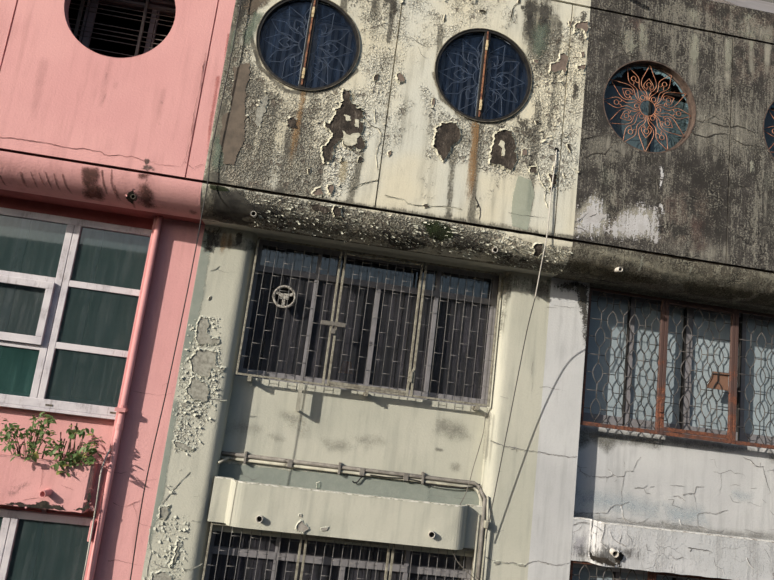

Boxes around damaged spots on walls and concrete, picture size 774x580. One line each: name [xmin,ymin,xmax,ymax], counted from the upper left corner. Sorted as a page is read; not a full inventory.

peeling [547,20,591,103]
damp [724,39,732,70]
damp [382,230,426,251]
peeling [252,88,572,275]
damp [453,237,481,251]
rust [467,110,481,191]
efflorescence [575,192,665,243]
crack [692,114,762,165]
peeling [171,315,226,455]
peeling [143,504,189,580]
crack [485,440,774,576]